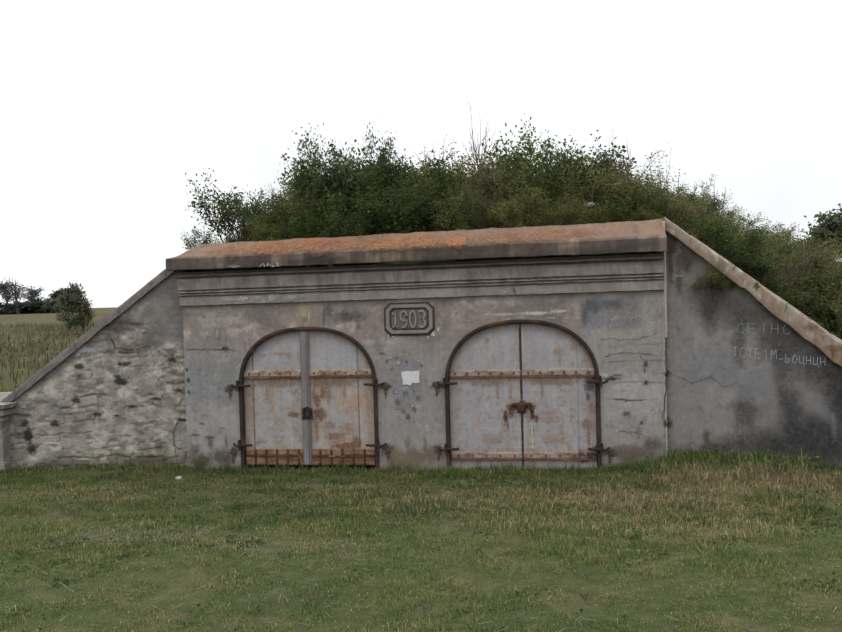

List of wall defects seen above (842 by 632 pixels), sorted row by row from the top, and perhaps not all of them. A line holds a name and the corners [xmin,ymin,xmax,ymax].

crack [600,334,743,418]
rust [503,389,538,449]